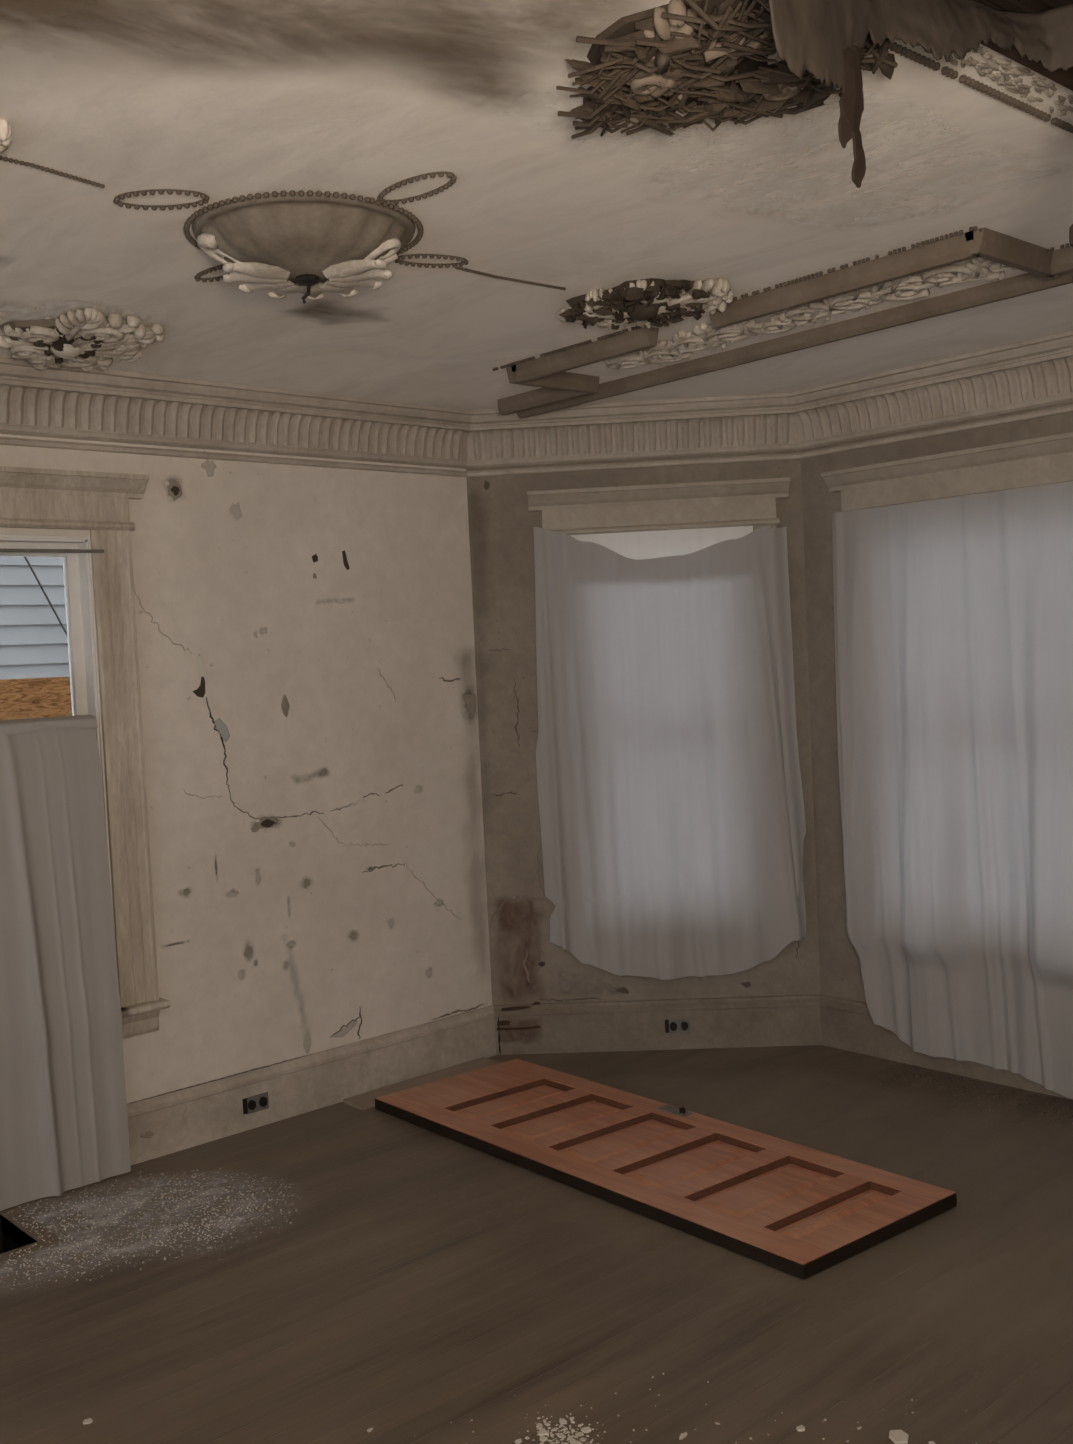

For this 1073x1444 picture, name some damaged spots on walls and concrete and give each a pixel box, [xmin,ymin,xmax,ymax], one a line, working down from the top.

damp [0,0,175,39]
damp [195,0,518,56]
flaking render [164,480,182,501]
flaking render [192,677,205,698]
crack [134,587,462,921]